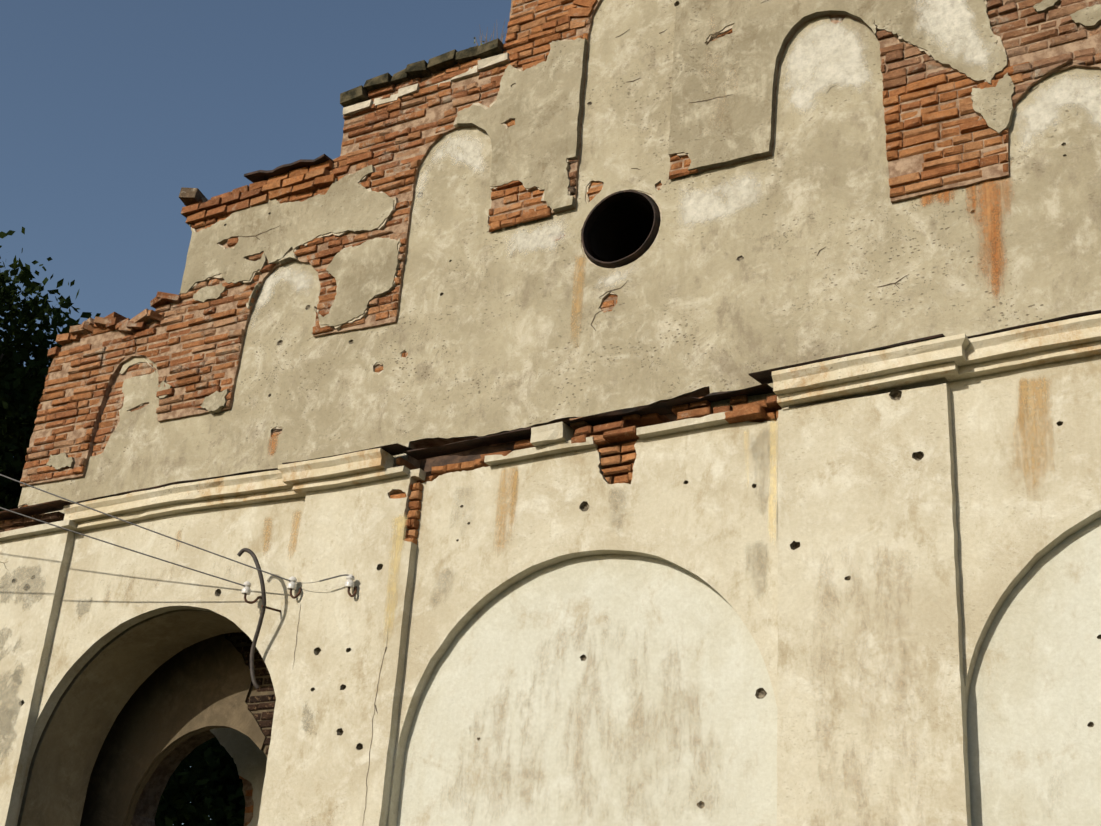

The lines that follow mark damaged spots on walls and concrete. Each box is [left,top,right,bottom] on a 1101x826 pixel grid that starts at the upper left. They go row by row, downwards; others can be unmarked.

flaking render [876,0,1101,198]
flaking render [191,214,231,232]
flaking render [268,0,603,335]
flaking render [656,154,698,190]
corrosion [967,179,1009,293]
flaking render [600,294,618,312]
flaking render [20,252,276,484]
flaking render [672,395,782,424]
flaking render [390,482,423,545]
flaking render [225,632,276,754]